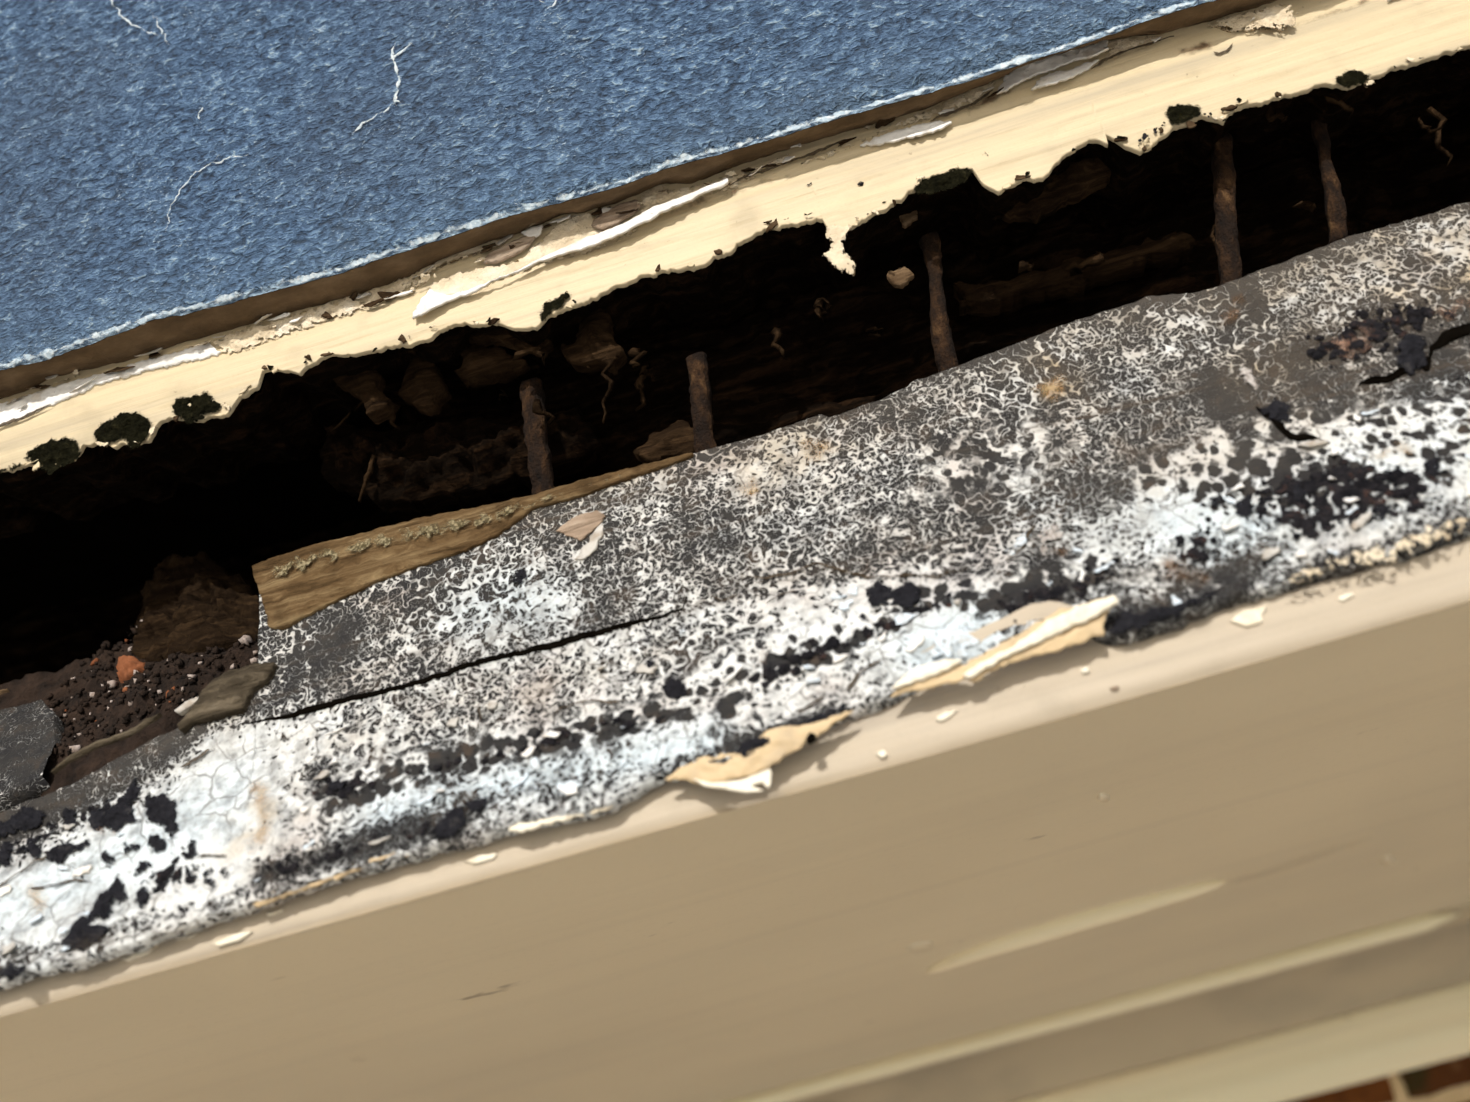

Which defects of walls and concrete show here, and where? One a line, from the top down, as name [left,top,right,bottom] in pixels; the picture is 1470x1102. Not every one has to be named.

peeling [0,36,1164,426]
damp [290,3,1188,284]
spalling [1236,106,1470,277]
damp [0,292,240,367]
spalling [400,180,1220,487]
crack [240,562,968,725]
mould [864,580,923,611]
peeling [833,595,1119,698]
crack [1004,526,1034,561]
crack [181,749,211,767]
peeling [664,709,854,793]
mould [0,777,230,951]